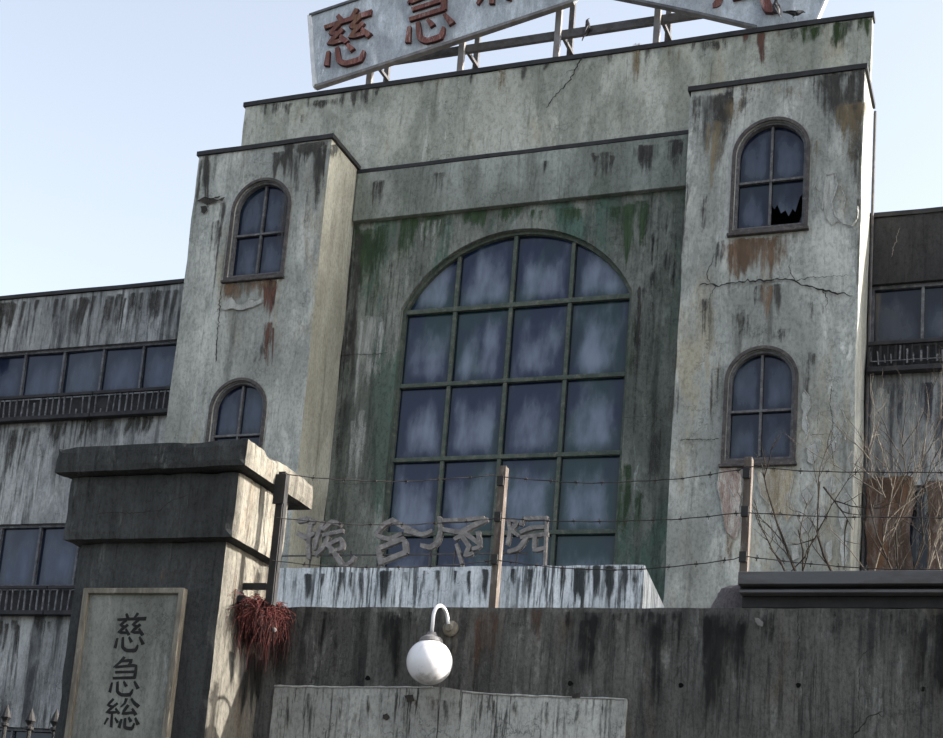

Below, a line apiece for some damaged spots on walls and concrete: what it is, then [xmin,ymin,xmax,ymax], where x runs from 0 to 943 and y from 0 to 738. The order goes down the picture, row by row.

crack [546,56,583,108]
water stain [693,85,747,184]
water stain [813,69,866,178]
corrosion [728,235,785,278]
crack [700,243,849,307]
water stain [0,300,39,328]
water stain [52,289,178,330]
corrosion [225,280,277,357]
water stain [340,233,386,471]
water stain [5,423,67,470]
spalling [716,468,742,539]
water stain [0,620,20,658]